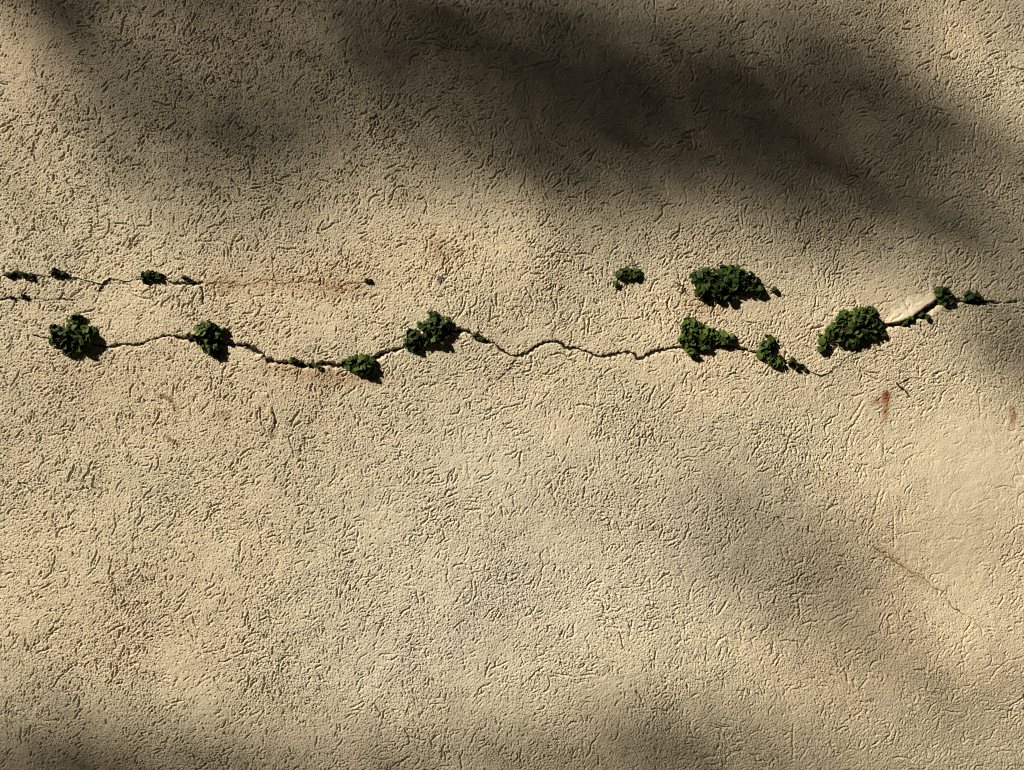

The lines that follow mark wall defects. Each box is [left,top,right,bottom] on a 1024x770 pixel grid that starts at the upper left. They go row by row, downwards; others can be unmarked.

crack [0,274,140,301]
crack [165,252,365,305]
crack [93,335,344,369]
crack [374,347,404,360]
crack [446,300,1020,380]